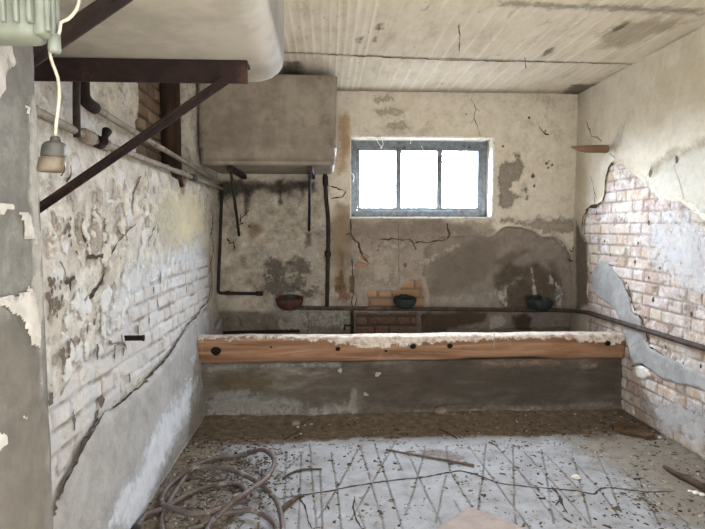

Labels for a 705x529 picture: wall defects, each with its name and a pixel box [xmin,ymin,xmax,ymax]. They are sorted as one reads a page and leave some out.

leakage [219,179,315,213]
spalling [0,169,209,498]
crack [59,217,235,498]
leakage [255,243,321,300]
crack [345,219,369,307]
crack [379,219,451,281]
leakage [421,263,564,333]
spalling [347,150,705,460]